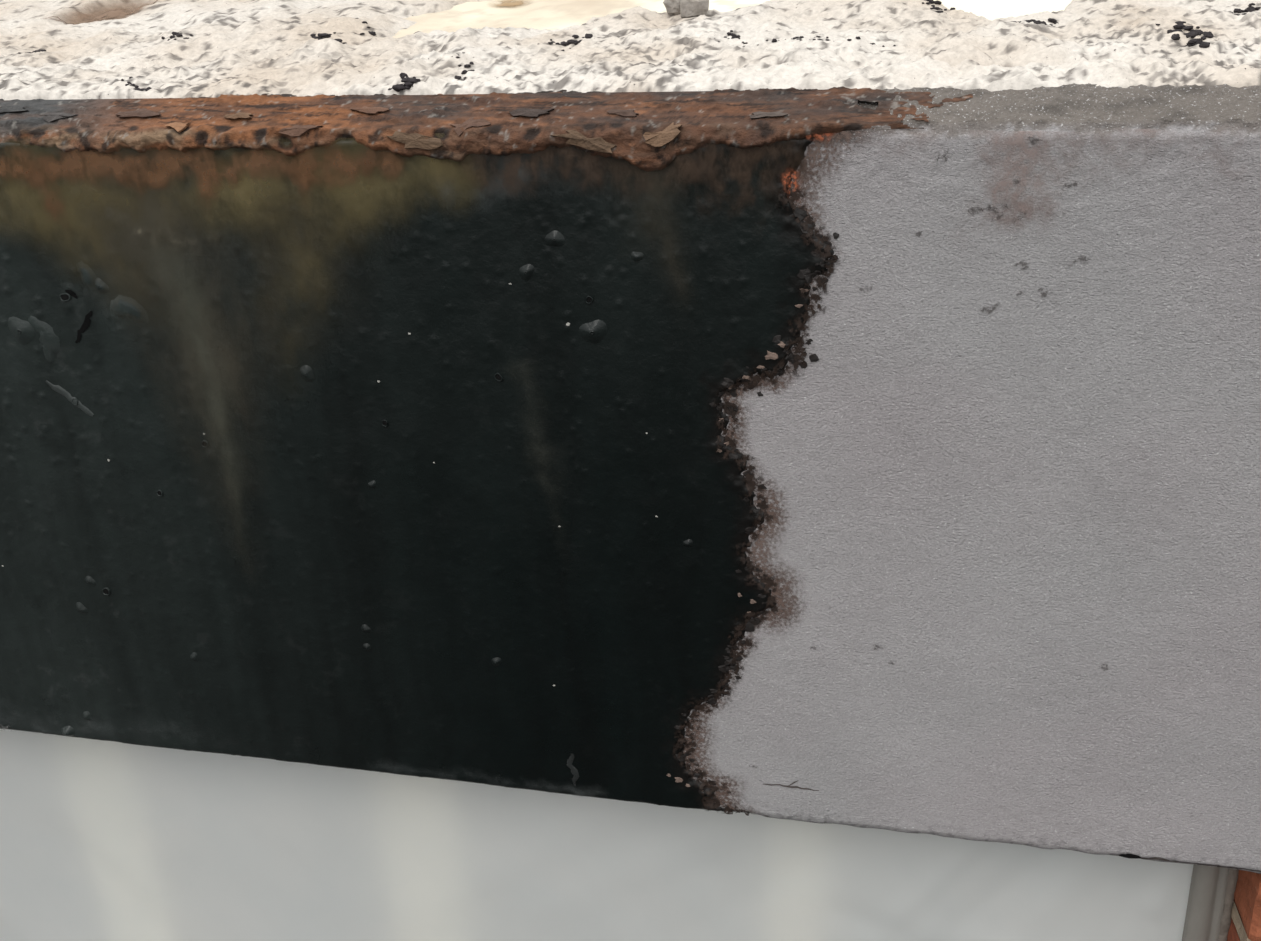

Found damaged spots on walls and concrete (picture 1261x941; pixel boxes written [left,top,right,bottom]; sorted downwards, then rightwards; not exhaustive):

damp [4,156,456,398]
corrosion [0,86,973,232]
peeling [667,187,839,816]